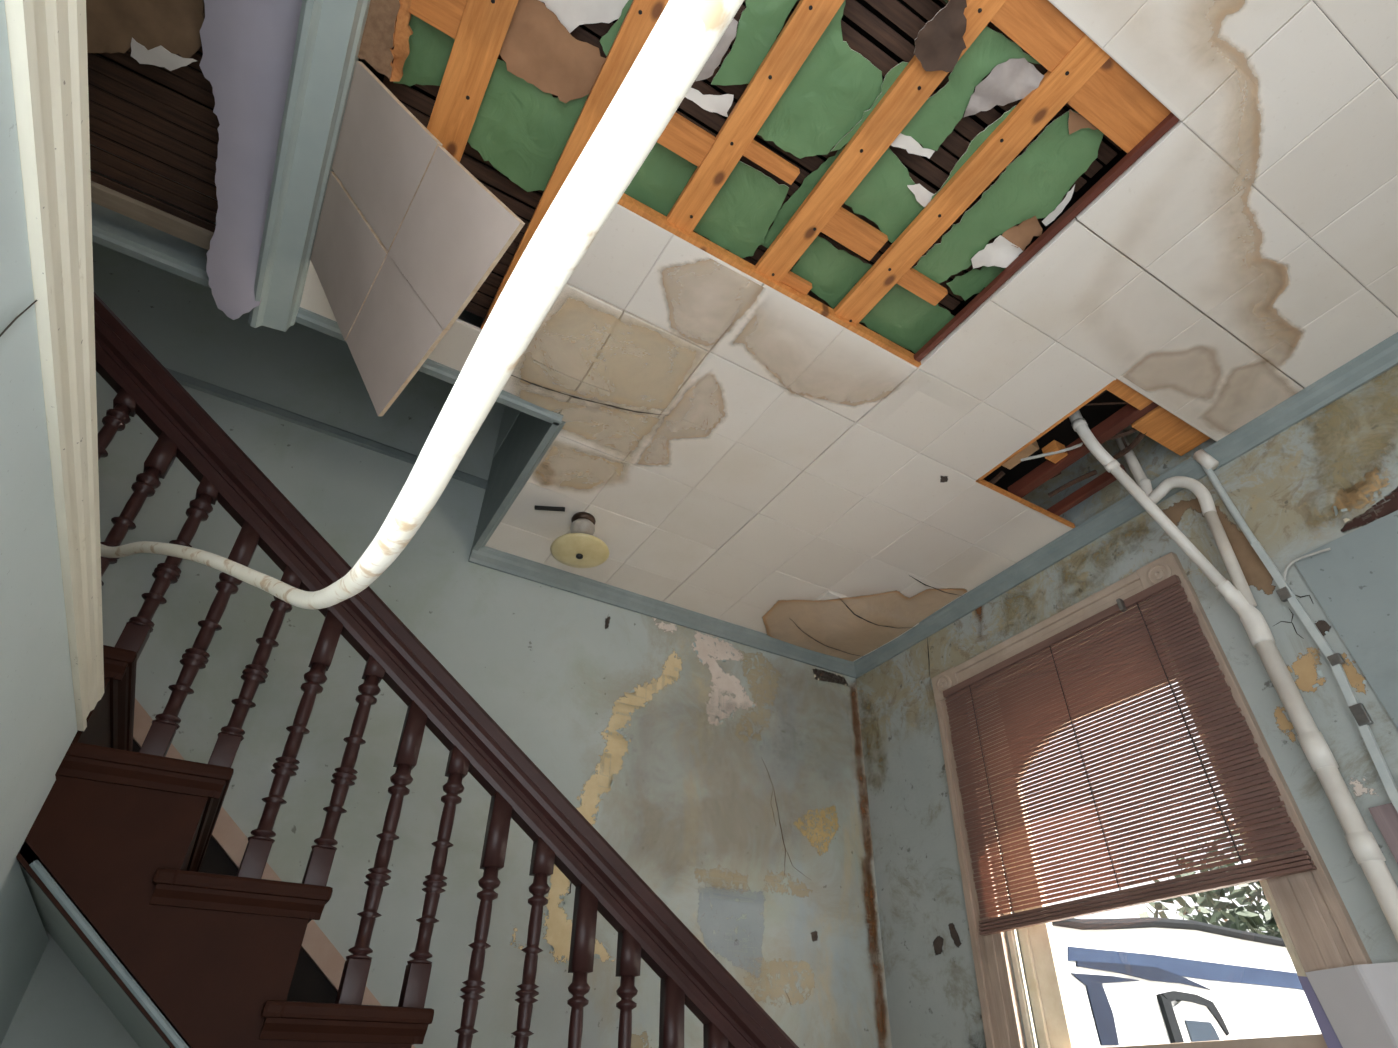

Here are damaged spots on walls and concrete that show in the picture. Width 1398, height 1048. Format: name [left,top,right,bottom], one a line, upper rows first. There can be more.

damp [1212,0,1301,347]
crack [0,300,38,337]
peeling [1329,467,1398,533]
peeling [1287,620,1331,693]
peeling [1341,653,1368,694]
peeling [576,617,757,826]
peeling [1274,707,1296,742]
peeling [543,864,573,964]
peeling [594,939,616,962]